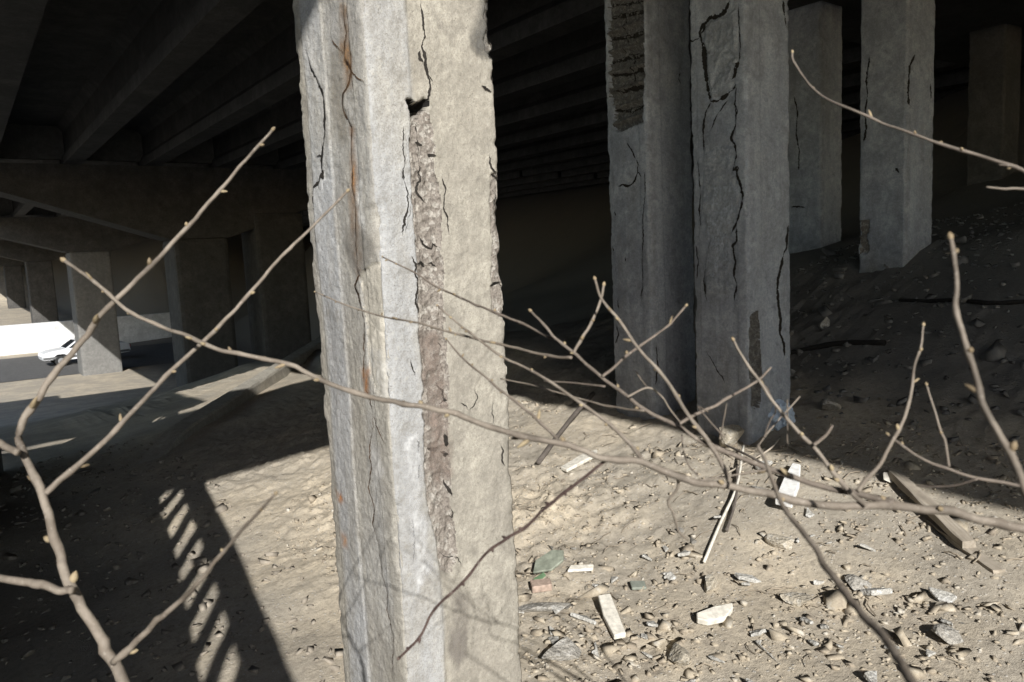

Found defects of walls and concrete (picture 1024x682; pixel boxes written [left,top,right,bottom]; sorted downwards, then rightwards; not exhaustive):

crack [308,0,363,228]
crack [402,4,449,310]
spalling [607,0,645,132]
crack [678,0,744,300]
crack [862,58,870,141]
crack [351,162,394,669]
spalling [409,110,458,573]
crack [414,433,454,518]
crack [412,520,461,563]
crack [410,359,494,422]
crack [776,206,805,356]